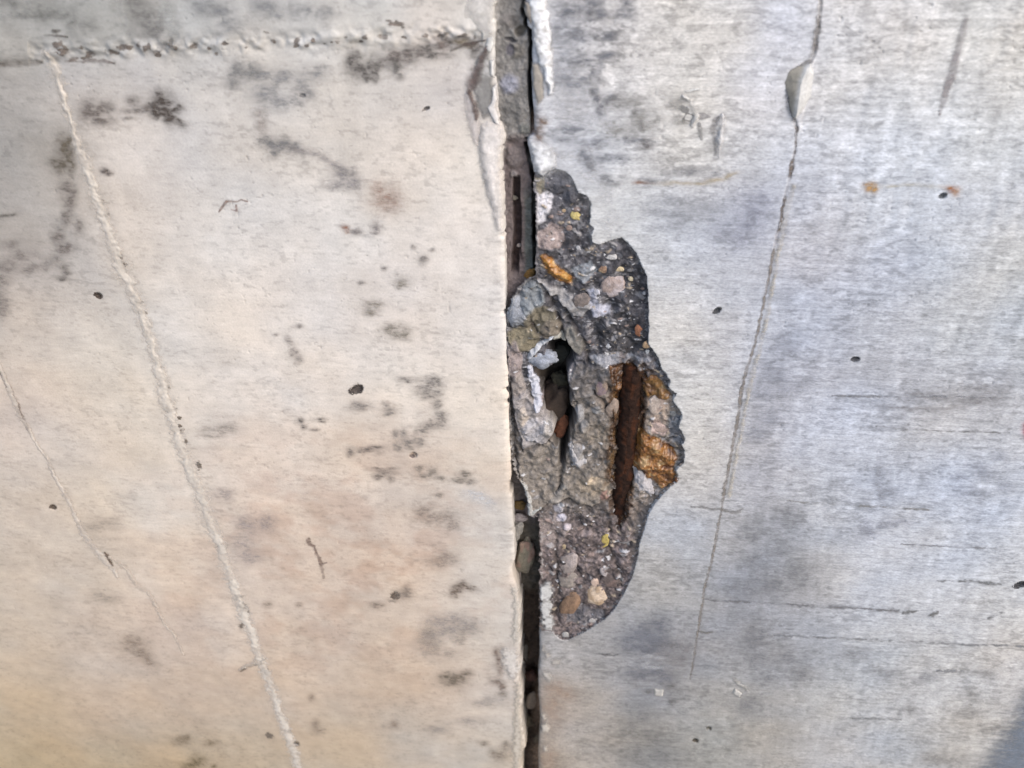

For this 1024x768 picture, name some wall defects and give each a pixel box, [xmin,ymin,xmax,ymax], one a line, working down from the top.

crack [809,15,821,62]
mould [82,103,112,123]
mould [127,92,182,124]
damp [229,65,310,106]
damp [347,0,503,229]
mould [54,138,75,171]
mould [394,378,444,450]
spalling [506,169,685,640]
crack [690,99,799,680]
corrosion [607,363,679,521]
crack [790,604,939,617]
crack [920,641,1024,673]